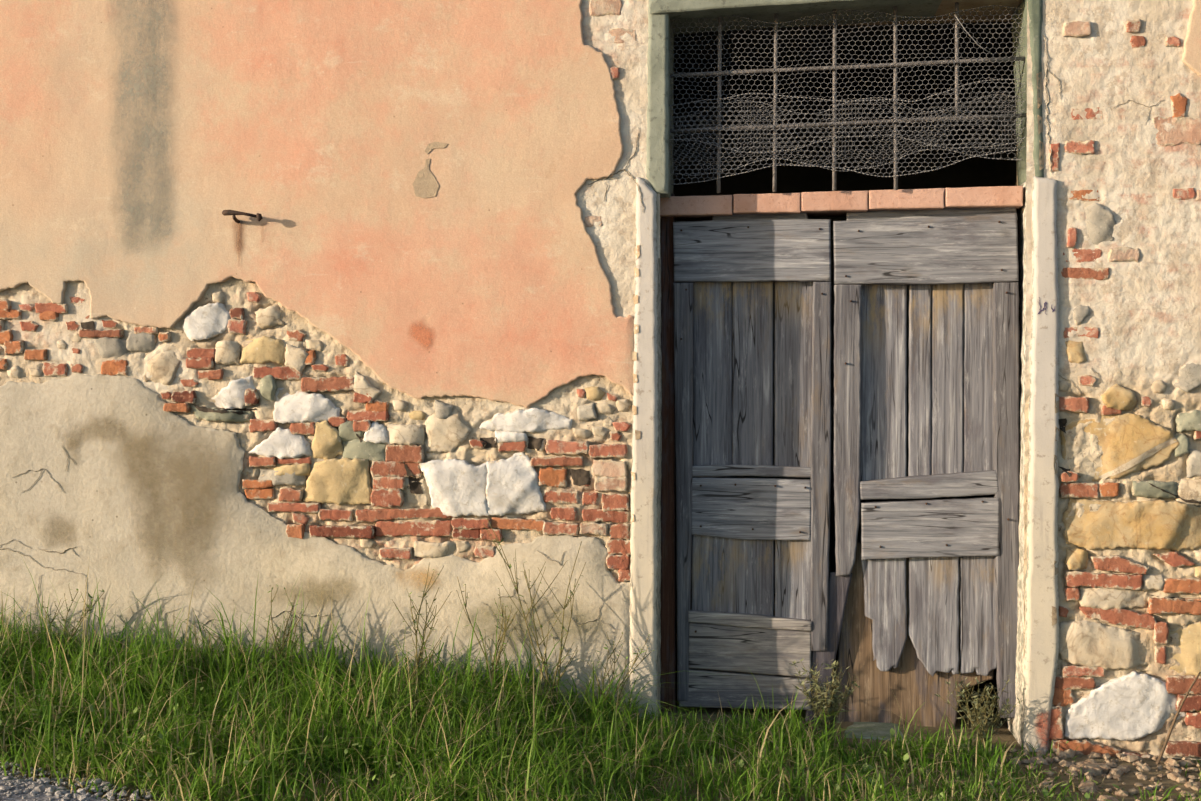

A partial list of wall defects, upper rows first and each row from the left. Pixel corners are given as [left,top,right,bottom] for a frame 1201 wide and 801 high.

damp [118,0,168,235]
peeling [413,142,447,198]
flaking render [576,0,660,334]
crack [12,446,75,492]
crack [0,539,91,619]
flaking render [0,277,641,583]
flaking render [1024,0,1201,760]